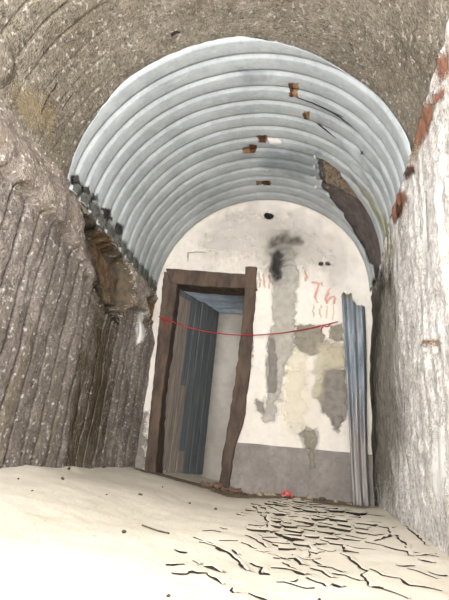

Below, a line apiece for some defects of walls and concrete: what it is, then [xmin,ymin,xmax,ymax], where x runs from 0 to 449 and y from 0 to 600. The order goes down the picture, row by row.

rust [288,83,299,97]
rust [242,135,282,153]
spalling [80,209,137,324]
damp [270,235,303,280]
spalling [313,155,390,285]
flaking render [255,265,343,422]
flaking render [317,369,348,432]
crack [164,505,448,600]